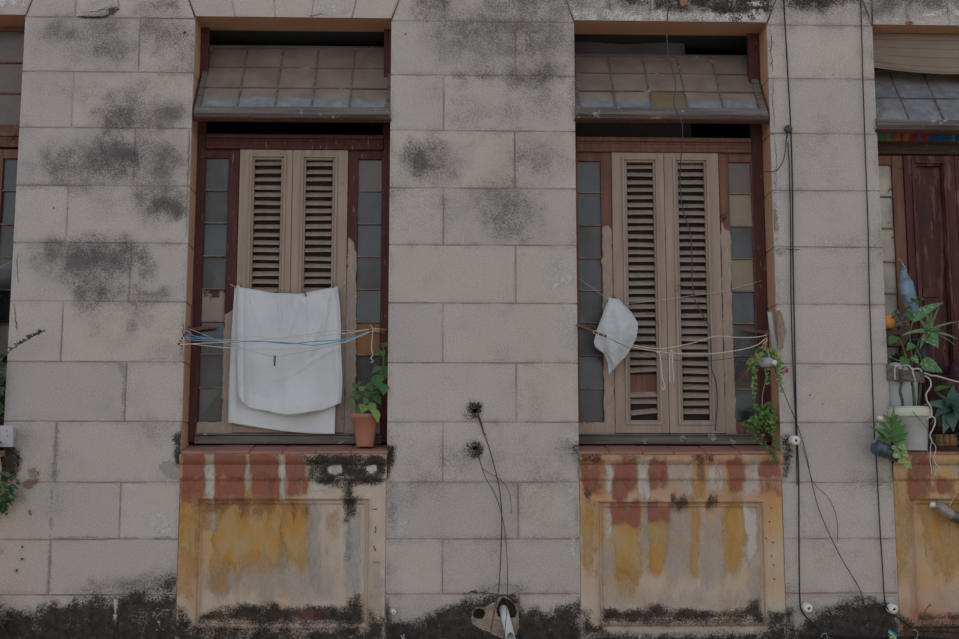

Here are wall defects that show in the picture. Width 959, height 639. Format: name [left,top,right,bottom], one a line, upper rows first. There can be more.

leakage [572,0,772,22]
leakage [786,0,848,12]
leakage [44,240,128,275]
leakage [0,444,959,639]
flaking render [471,584,521,639]